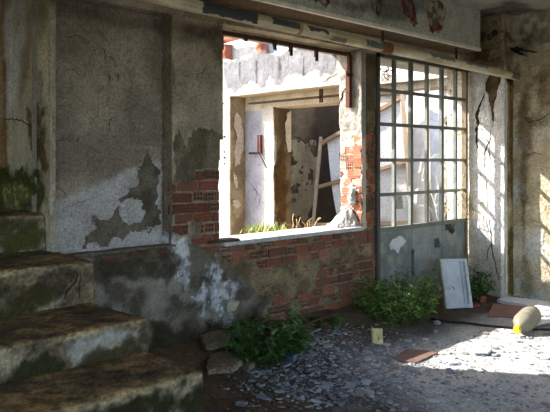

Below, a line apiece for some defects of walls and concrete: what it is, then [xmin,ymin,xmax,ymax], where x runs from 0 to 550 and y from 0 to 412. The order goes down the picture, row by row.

peeling [202,1,259,24]
peeling [272,17,347,44]
peeling [426,0,447,34]
crack [475,94,491,167]
flaking render [79,146,161,249]
flaking render [168,110,375,322]
leakage [98,234,191,290]
leakage [150,263,240,350]